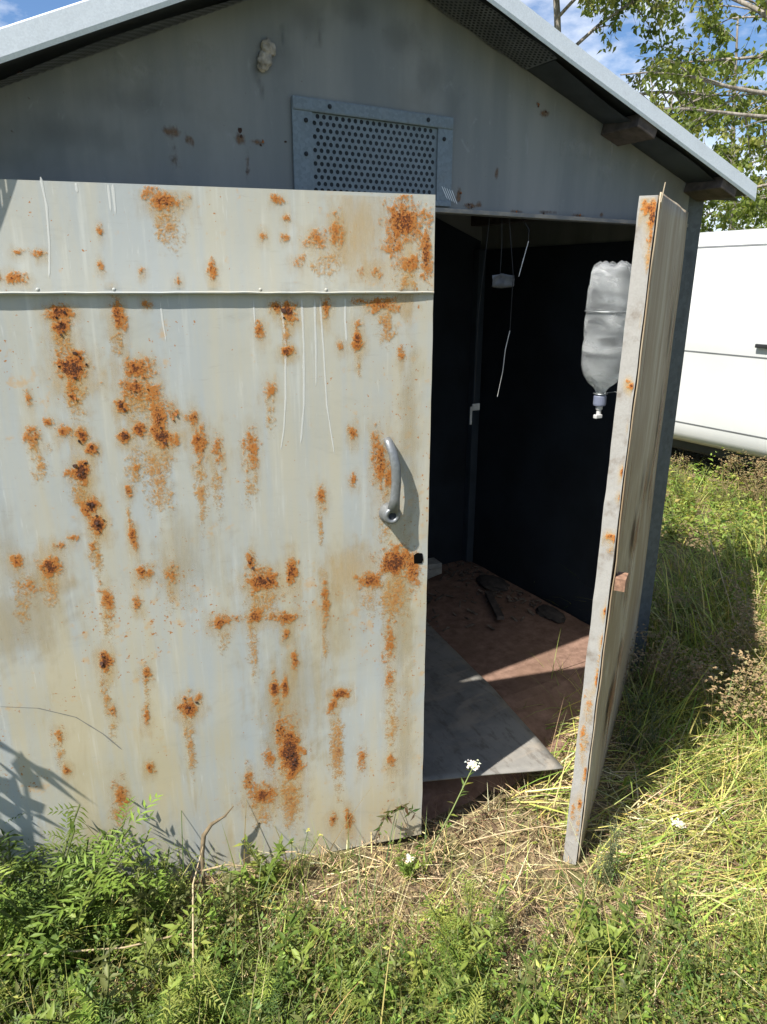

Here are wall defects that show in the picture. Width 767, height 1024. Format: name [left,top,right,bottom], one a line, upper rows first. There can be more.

corrosion [141,186,190,248]
corrosion [351,194,434,359]
corrosion [641,199,657,269]
corrosion [337,319,365,372]
corrosion [10,303,114,633]
corrosion [111,298,226,524]
corrosion [241,431,259,500]
corrosion [371,424,391,499]
corrosion [209,552,299,675]
corrosion [352,524,423,766]
corrosion [177,691,202,769]
corrosion [243,652,307,827]